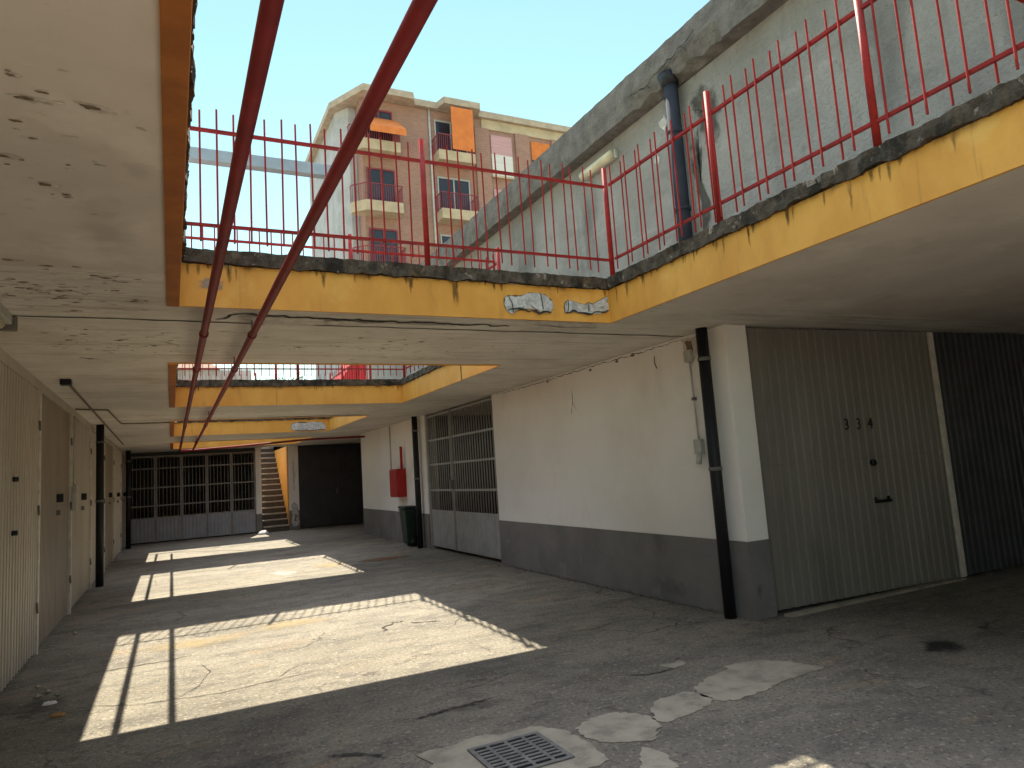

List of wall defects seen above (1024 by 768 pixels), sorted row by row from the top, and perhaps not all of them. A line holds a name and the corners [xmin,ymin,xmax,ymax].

damp [692,89,717,230]
crack [215,314,509,327]
peeling [504,292,609,330]